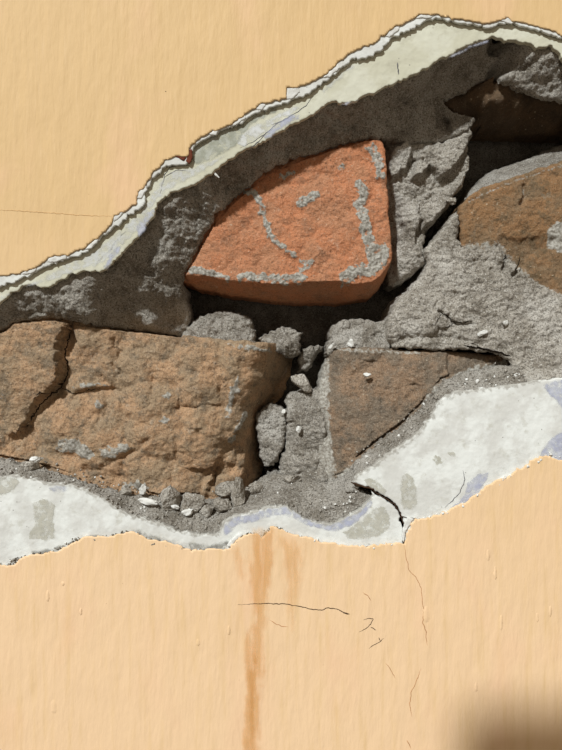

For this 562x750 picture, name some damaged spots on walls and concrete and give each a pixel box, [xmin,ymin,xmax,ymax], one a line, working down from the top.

spalling [0,14,562,305]
crack [18,326,100,433]
spalling [0,378,562,566]
crack [351,482,415,524]
crack [238,603,382,648]
crack [405,550,427,641]